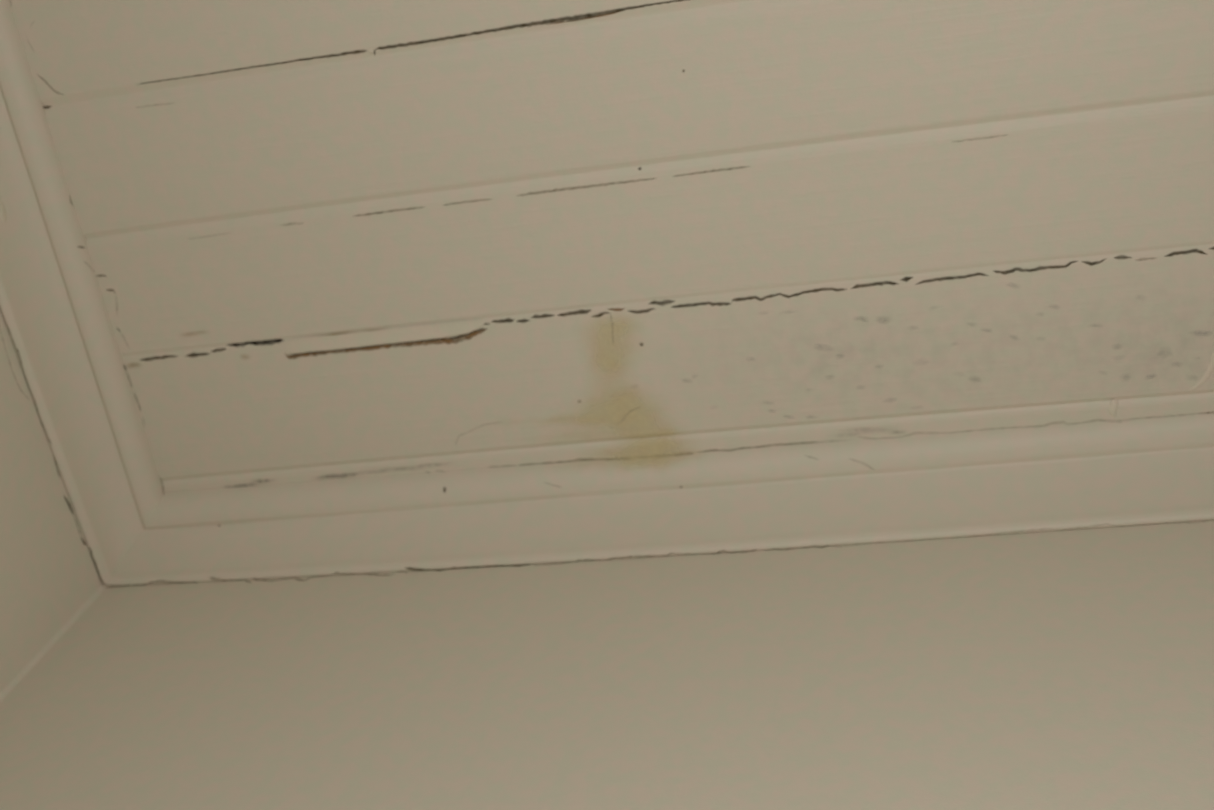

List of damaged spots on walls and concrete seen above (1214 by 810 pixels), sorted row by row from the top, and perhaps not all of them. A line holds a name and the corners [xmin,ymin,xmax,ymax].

crack [137,0,684,85]
crack [1164,247,1214,257]
crack [123,256,1131,410]
crack [406,563,532,571]